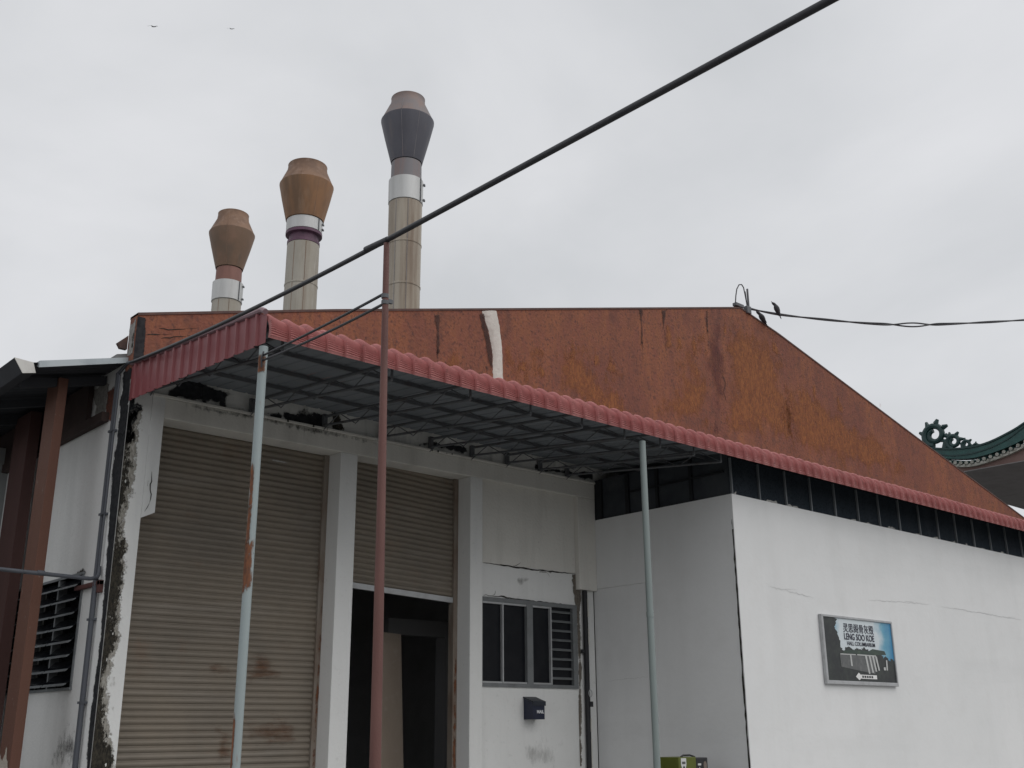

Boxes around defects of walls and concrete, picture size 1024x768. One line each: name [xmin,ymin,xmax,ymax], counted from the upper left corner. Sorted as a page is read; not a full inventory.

peeling [90,403,143,768]
corrosion [242,463,254,593]